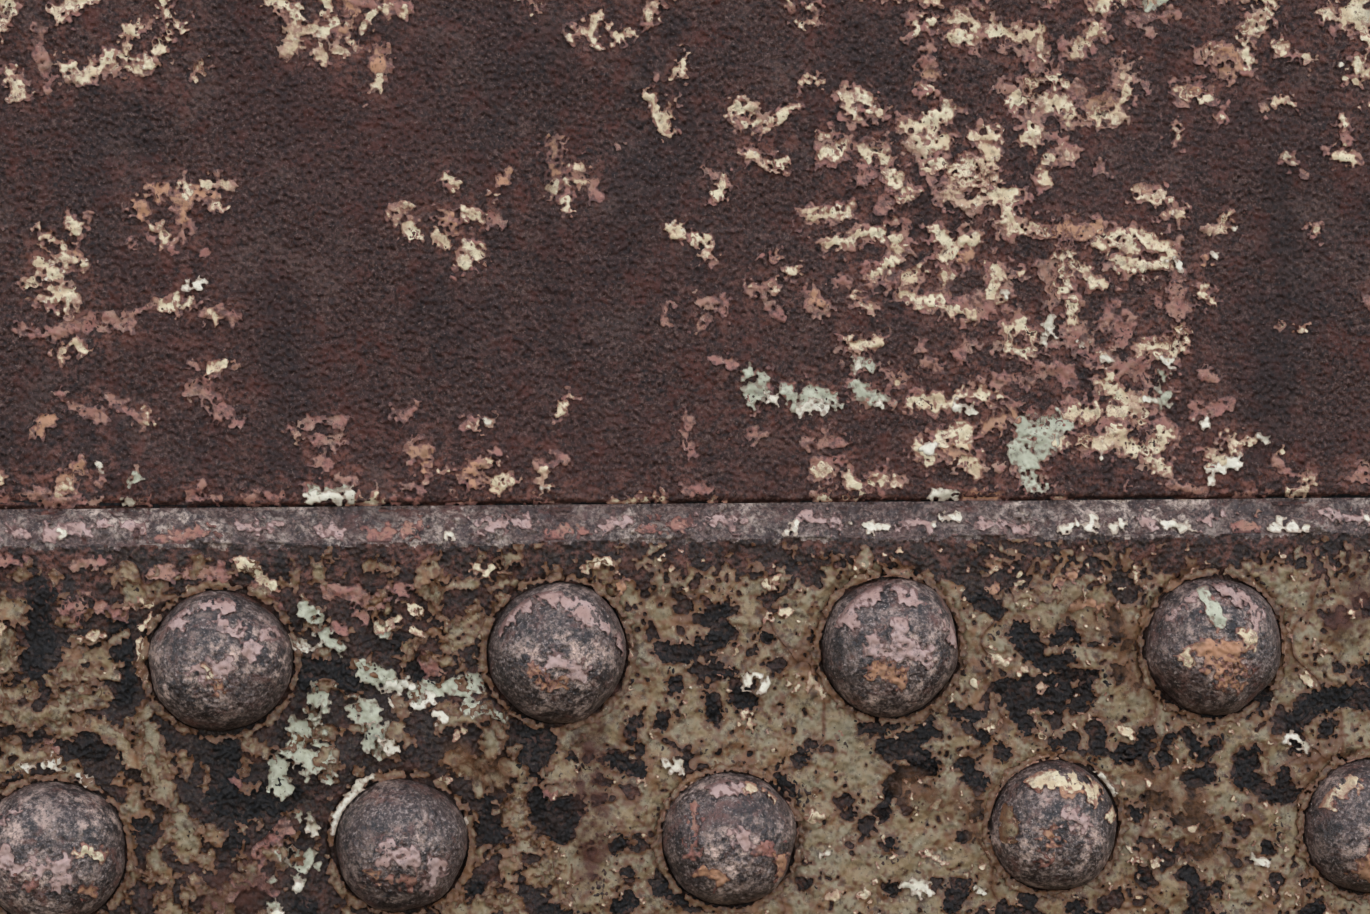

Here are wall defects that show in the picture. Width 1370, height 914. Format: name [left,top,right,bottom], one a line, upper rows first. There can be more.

peeling [0,0,218,112]
peeling [260,0,415,108]
peeling [1276,0,1370,180]
peeling [11,206,247,442]
peeling [121,169,239,259]
peeling [384,165,513,282]
rust [0,0,1370,515]
peeling [663,219,722,269]
peeling [707,0,1271,565]
peeling [233,398,522,542]
peeling [0,444,1370,914]
rust [0,533,1370,914]